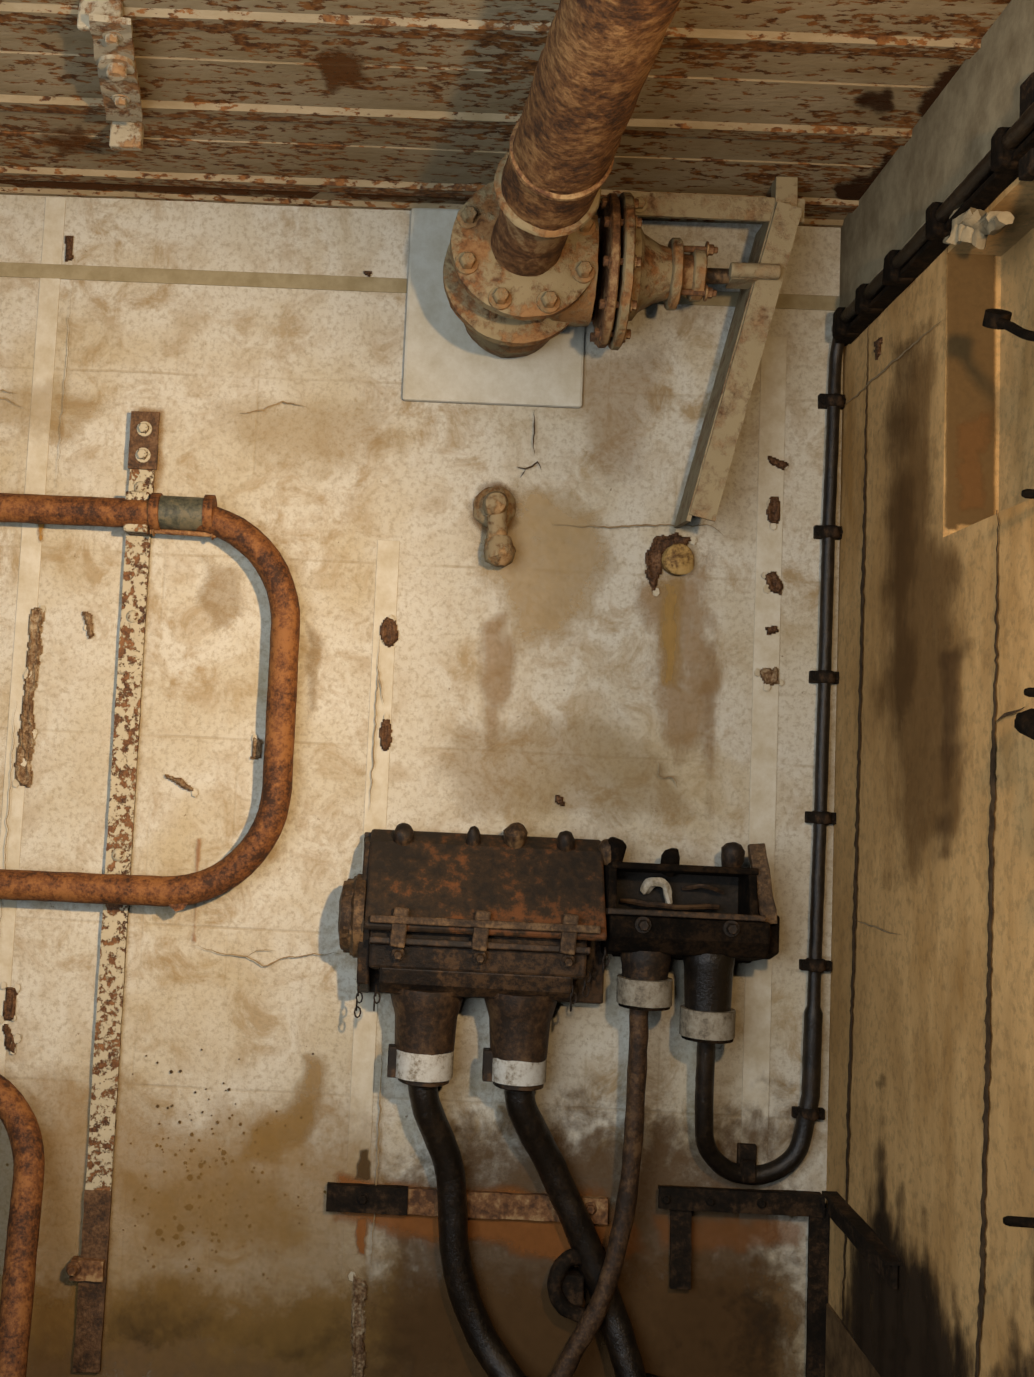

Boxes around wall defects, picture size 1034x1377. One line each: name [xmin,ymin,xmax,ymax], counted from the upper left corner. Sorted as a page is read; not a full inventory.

rust [315,49,366,93]
rust [856,90,894,113]
rust [918,65,961,117]
rust [833,154,892,200]
water stain [644,584,701,741]
crack [201,947,339,967]
rust [338,1150,396,1185]
water stain [26,1053,444,1377]
rust [342,1212,439,1254]
rust [468,1218,571,1259]
water stain [841,1148,973,1377]
water stain [718,1258,805,1377]